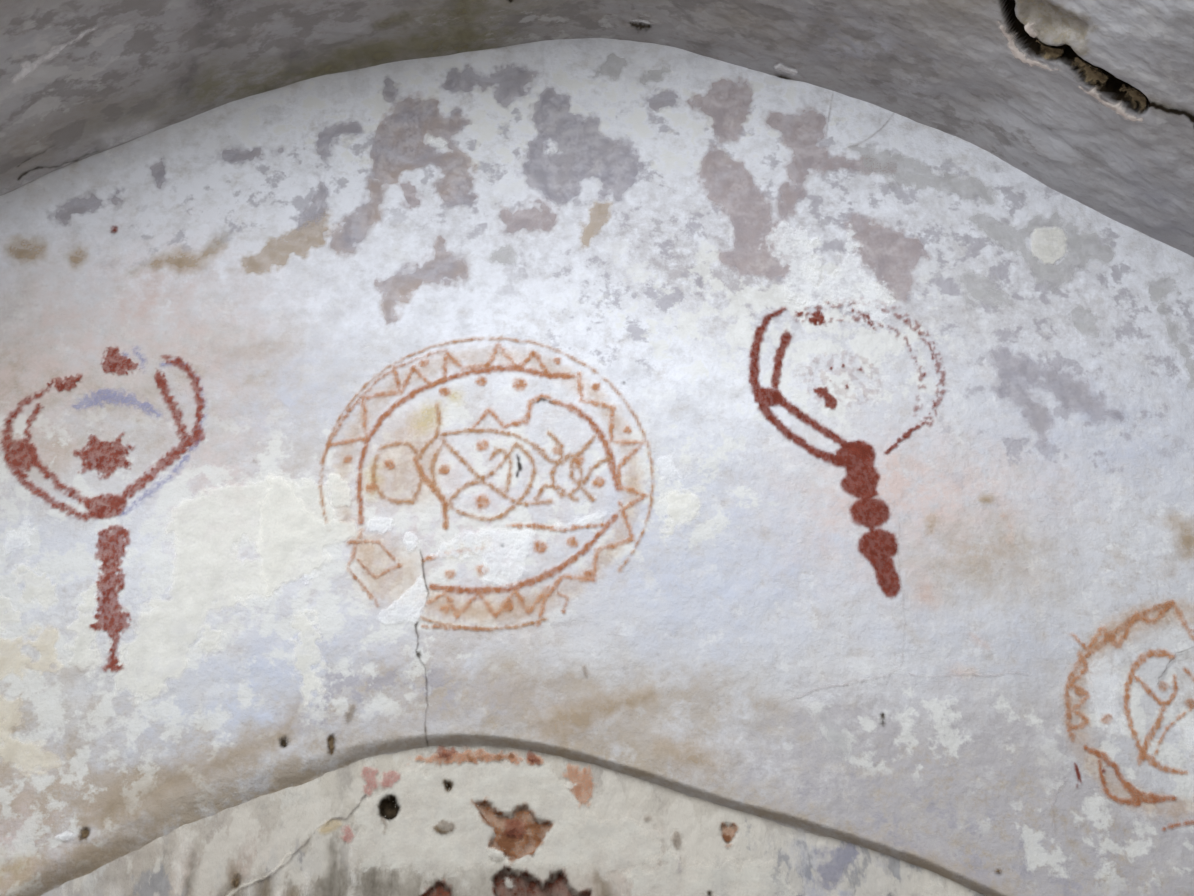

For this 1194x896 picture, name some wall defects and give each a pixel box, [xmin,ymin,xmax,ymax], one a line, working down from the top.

crack [1000,0,1194,122]
crack [18,158,79,180]
peeling [150,161,165,188]
peeling [222,148,261,163]
peeling [243,65,640,273]
peeling [641,66,1113,300]
peeling [56,191,122,225]
peeling [374,236,468,324]
spalling [435,820,454,833]
spalling [475,800,590,896]
spalling [422,881,451,896]